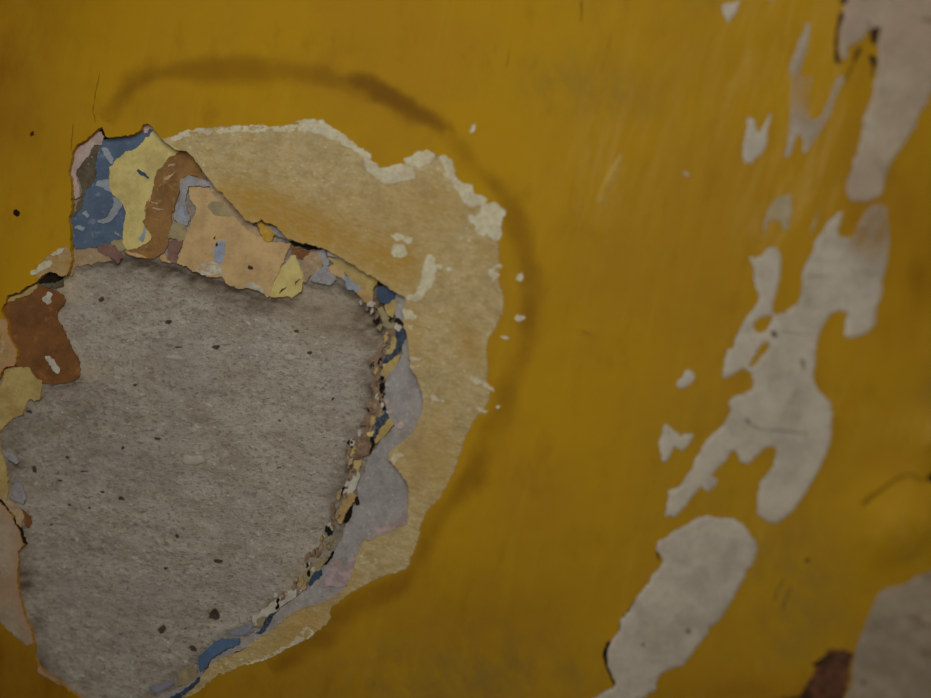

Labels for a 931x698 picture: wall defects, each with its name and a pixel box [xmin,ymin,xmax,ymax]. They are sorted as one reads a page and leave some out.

peeling [665,0,931,523]
spalling [0,118,509,698]
peeling [658,424,693,461]
peeling [596,515,758,698]
corrosion [790,649,854,698]
peeling [845,571,931,698]